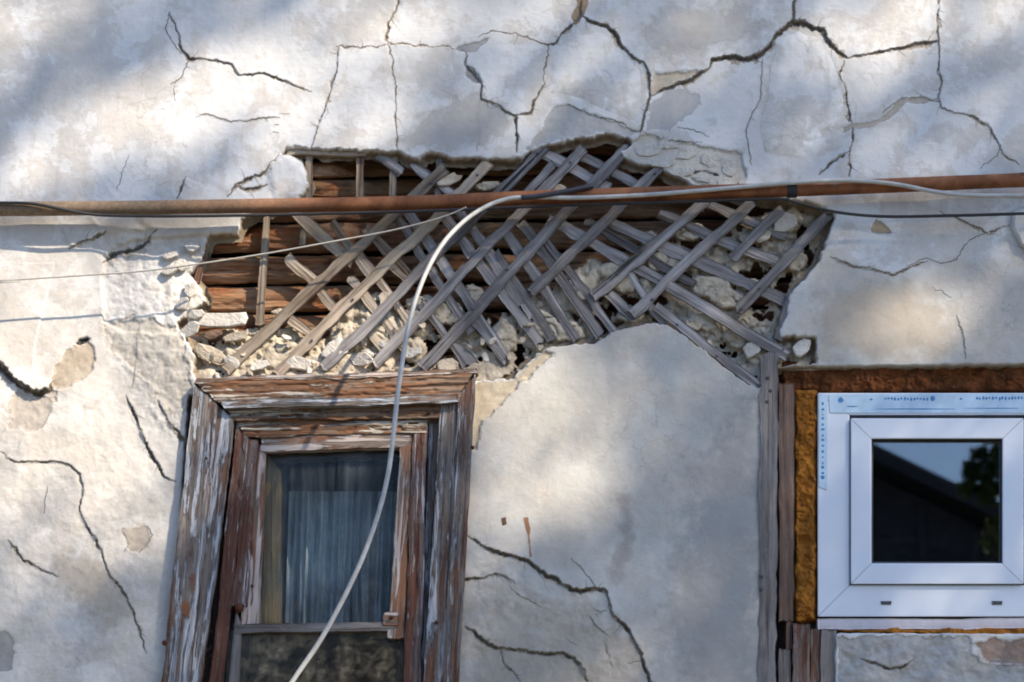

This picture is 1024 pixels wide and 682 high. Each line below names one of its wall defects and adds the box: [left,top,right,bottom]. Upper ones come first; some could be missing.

crack [165,0,1019,197]
spalling [437,172,463,186]
spalling [474,181,500,191]
crack [69,229,156,263]
spalling [104,206,827,450]
crack [0,361,54,398]
peeling [8,338,95,432]
crack [126,367,186,482]
crack [1,452,153,654]
peeling [122,526,149,551]
crack [465,535,655,682]
peeling [837,634,1024,682]